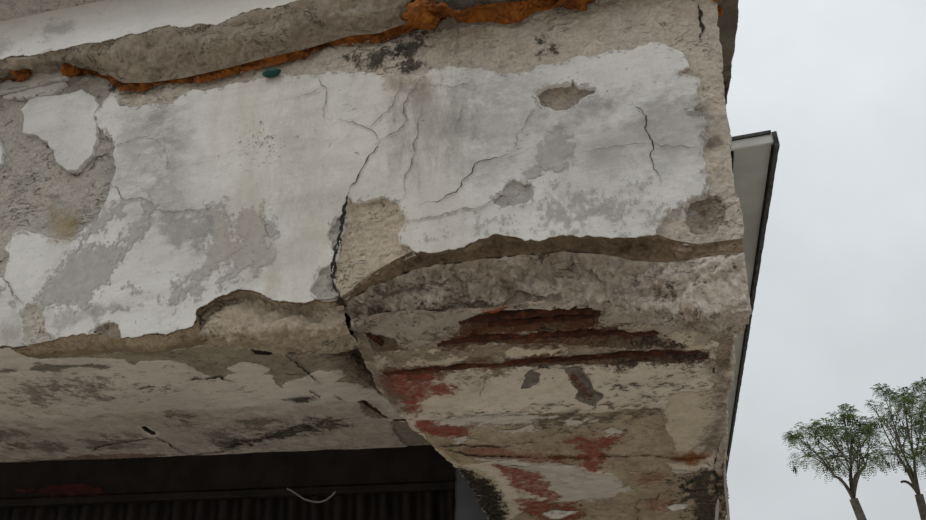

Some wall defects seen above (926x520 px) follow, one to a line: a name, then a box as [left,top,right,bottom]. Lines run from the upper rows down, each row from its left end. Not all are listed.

crack [587,102,698,181]
peeling [0,0,752,395]
crack [297,74,534,380]
corrosion [380,306,703,381]
water stain [0,370,128,409]
crack [91,355,346,455]
water stain [218,416,354,449]
peeling [358,347,730,520]
corrosion [641,451,709,466]